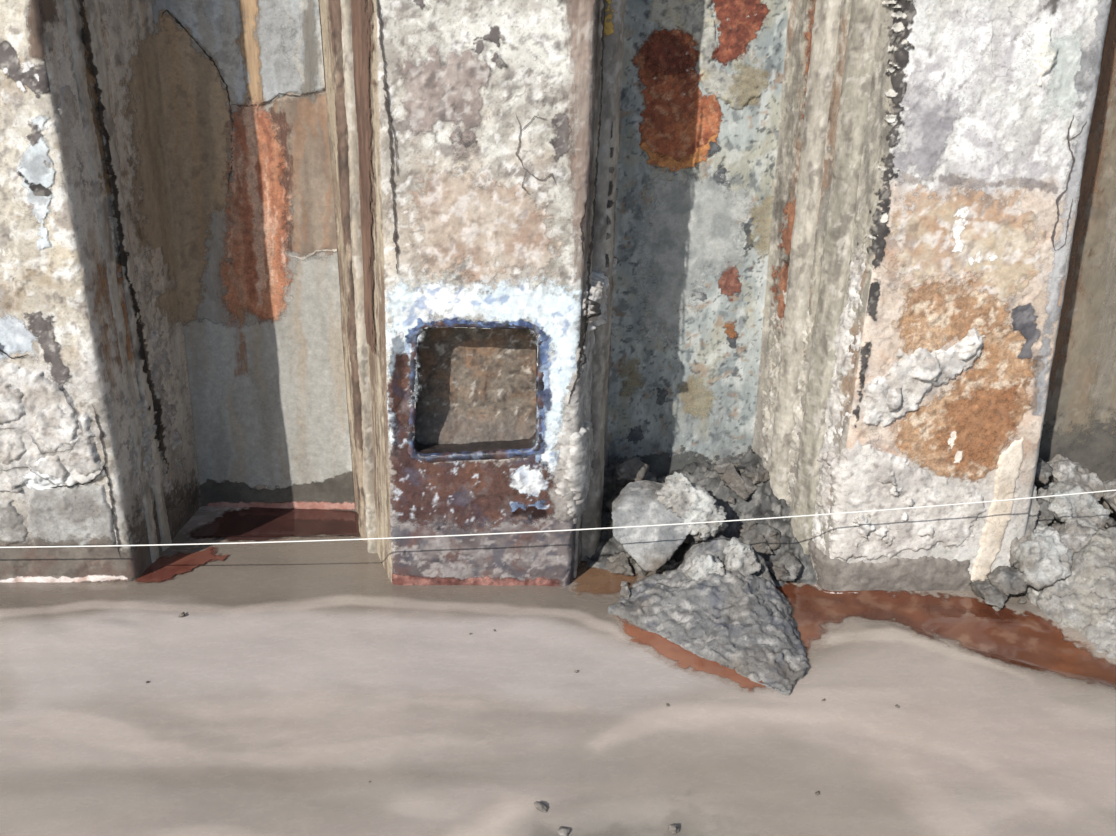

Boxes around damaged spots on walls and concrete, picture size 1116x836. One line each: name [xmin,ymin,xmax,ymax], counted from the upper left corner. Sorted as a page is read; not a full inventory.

spalling [0,41,50,98]
peeling [17,115,55,250]
crack [376,0,399,274]
crack [569,0,606,401]
rust [632,0,770,172]
crack [1051,115,1087,251]
rust [1049,0,1116,395]
crack [50,405,120,555]
rust [387,353,556,531]
damp [399,317,552,463]
rust [891,278,1037,482]
peeling [955,333,983,360]